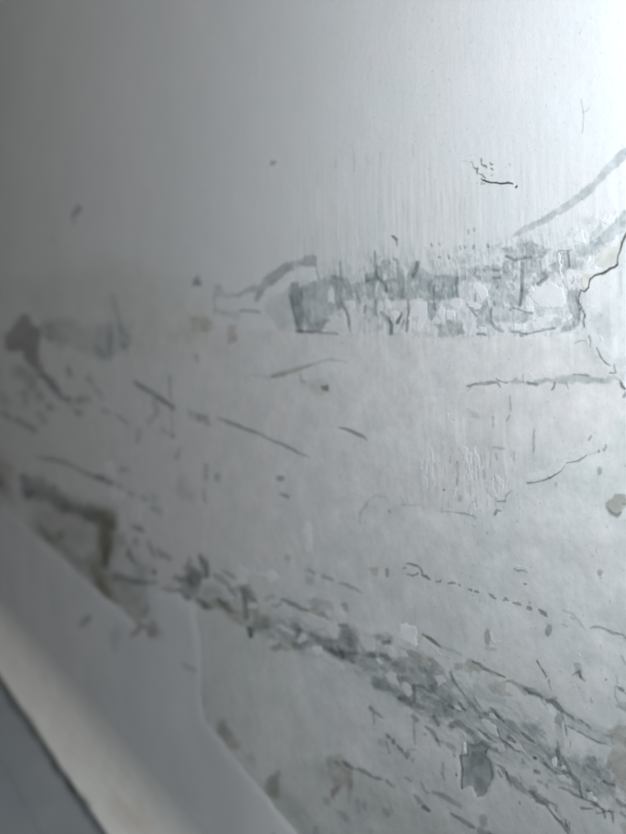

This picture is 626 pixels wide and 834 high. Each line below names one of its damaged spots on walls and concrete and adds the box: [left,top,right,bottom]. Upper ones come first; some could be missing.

peeling [263,267,318,299]
peeling [384,283,488,332]
peeling [513,253,573,331]
crack [581,234,626,292]
peeling [272,604,346,672]
peeling [361,622,442,697]
peeling [475,713,525,754]
peeling [551,757,572,785]